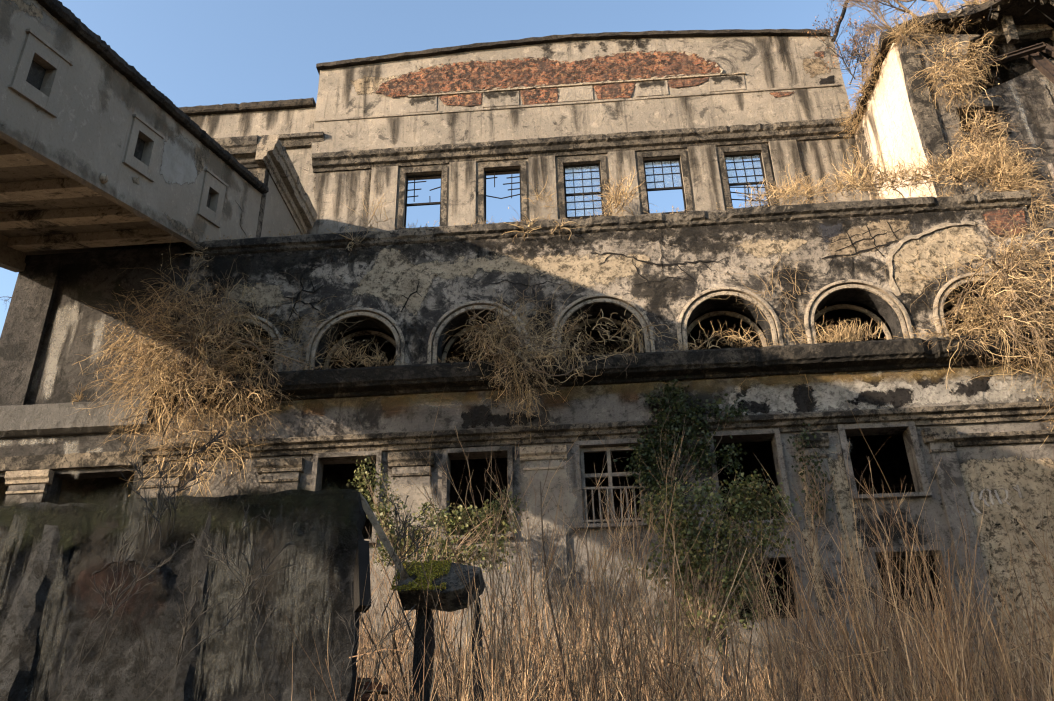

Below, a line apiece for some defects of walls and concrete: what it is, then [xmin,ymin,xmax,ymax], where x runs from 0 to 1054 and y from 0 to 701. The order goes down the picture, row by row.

damp [600,38,649,52]
damp [345,66,380,107]
damp [484,90,518,122]
spalling [374,50,723,106]
damp [639,80,665,88]
damp [711,76,742,109]
damp [757,37,811,120]
damp [1003,47,1044,143]
crack [596,229,729,285]
flaking render [826,208,1028,296]